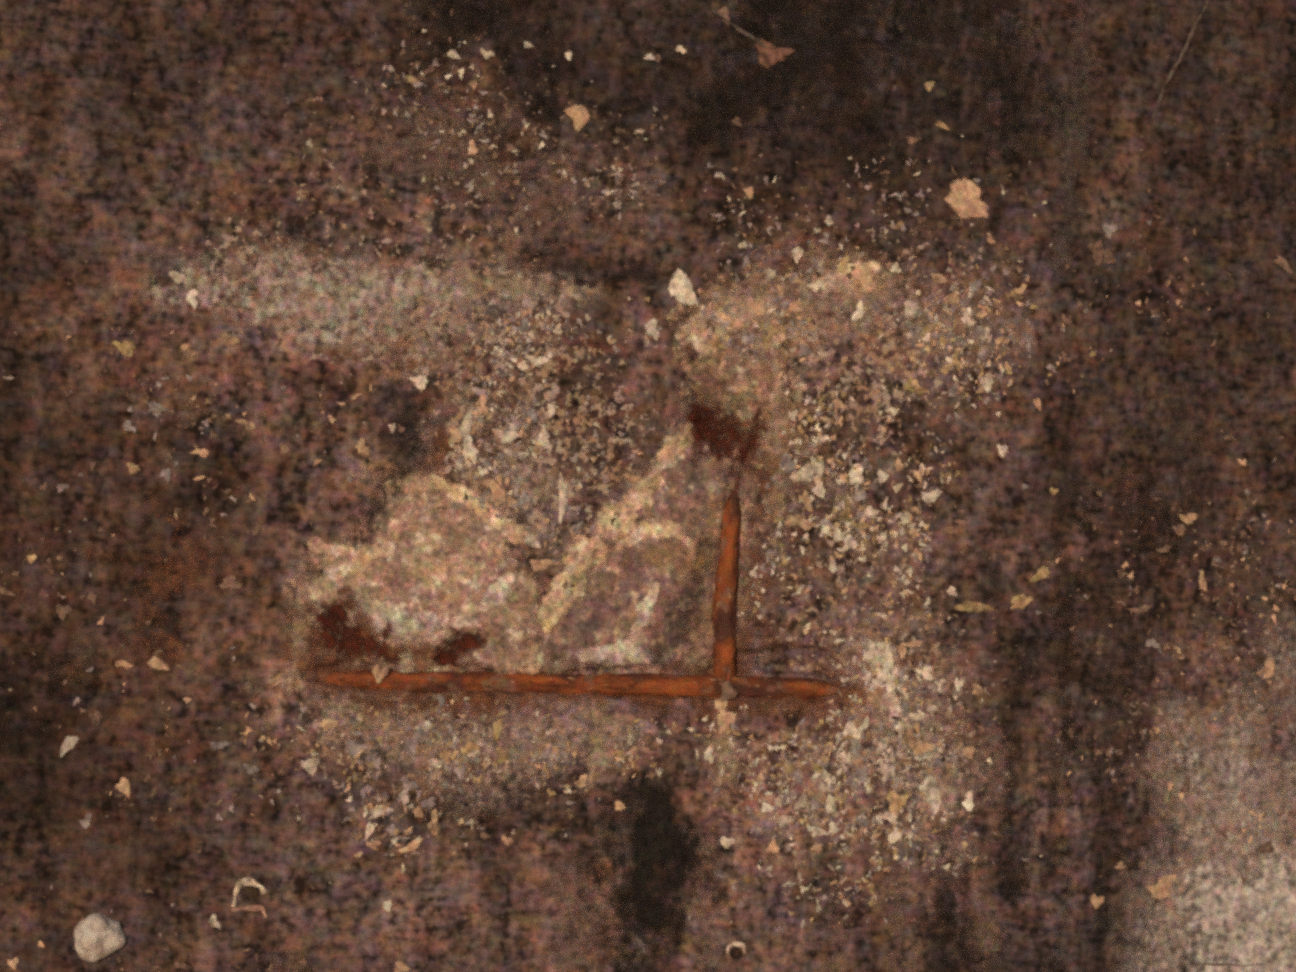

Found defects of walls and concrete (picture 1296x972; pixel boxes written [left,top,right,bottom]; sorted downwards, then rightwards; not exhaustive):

peeling [303,29,672,236]
peeling [169,271,200,319]
peeling [123,329,300,483]
peeling [58,725,79,757]
peeling [110,697,192,806]
rust [316,403,865,704]
spalling [210,136,1060,933]
damp [614,769,731,972]
damp [862,623,950,757]
damp [932,762,982,861]
peeling [1135,488,1296,794]
damp [1140,713,1296,972]